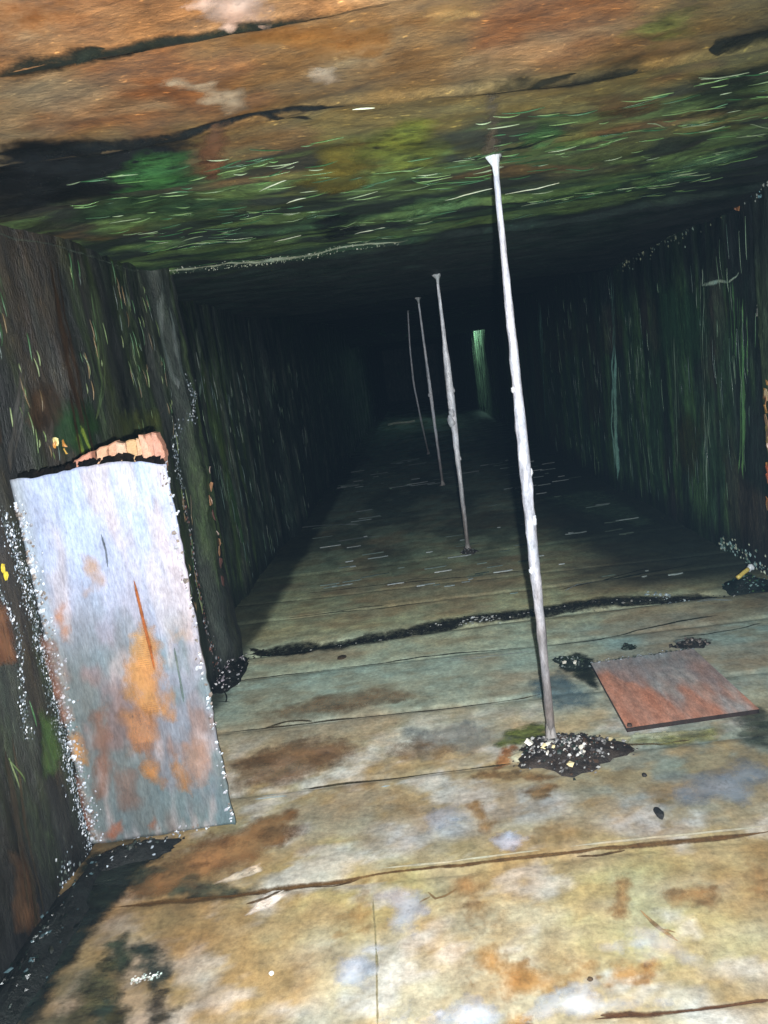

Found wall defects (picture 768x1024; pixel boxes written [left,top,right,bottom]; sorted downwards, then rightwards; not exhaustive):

crack [0,5,386,77]
leakage [0,141,192,216]
leakage [169,215,404,274]
rust [123,582,173,750]
crack [277,570,525,619]
crack [551,615,760,646]
crack [112,825,768,908]